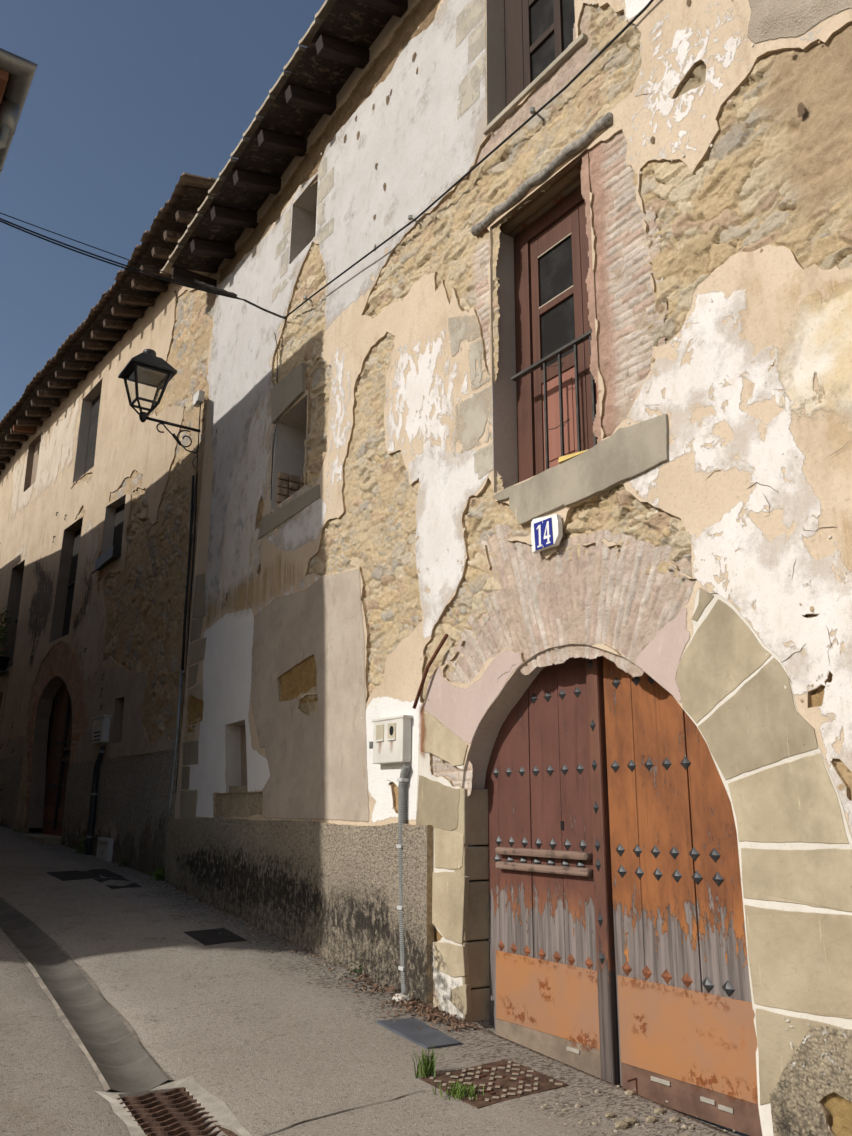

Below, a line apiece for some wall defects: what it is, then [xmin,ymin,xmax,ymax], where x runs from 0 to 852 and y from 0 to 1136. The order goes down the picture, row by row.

peeling [76,0,852,834]
flaking render [23,641,87,833]
flaking render [822,1092,852,1136]